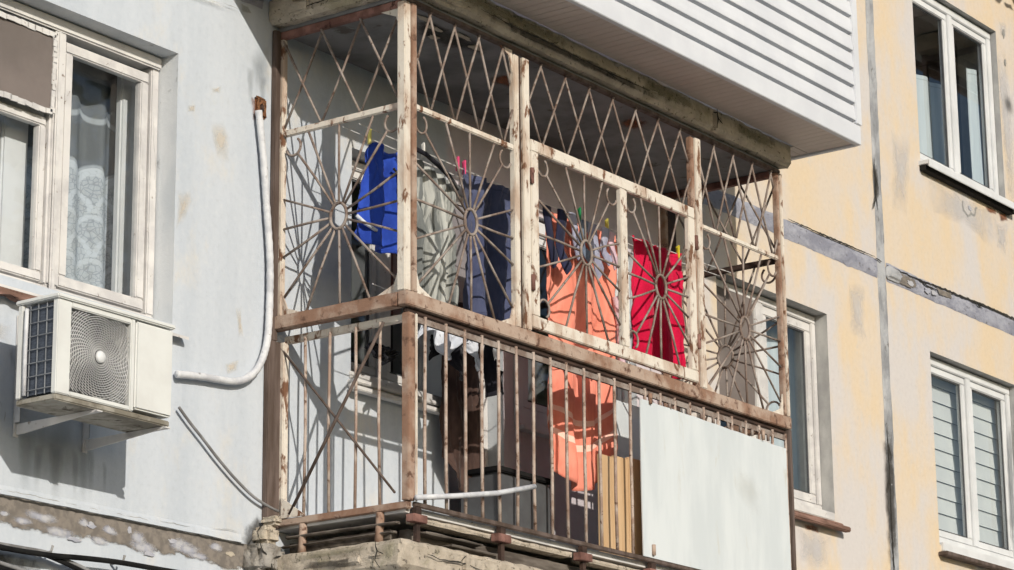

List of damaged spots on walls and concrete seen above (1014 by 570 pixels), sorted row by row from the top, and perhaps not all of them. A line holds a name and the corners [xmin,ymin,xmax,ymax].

peeling [0,495,285,570]